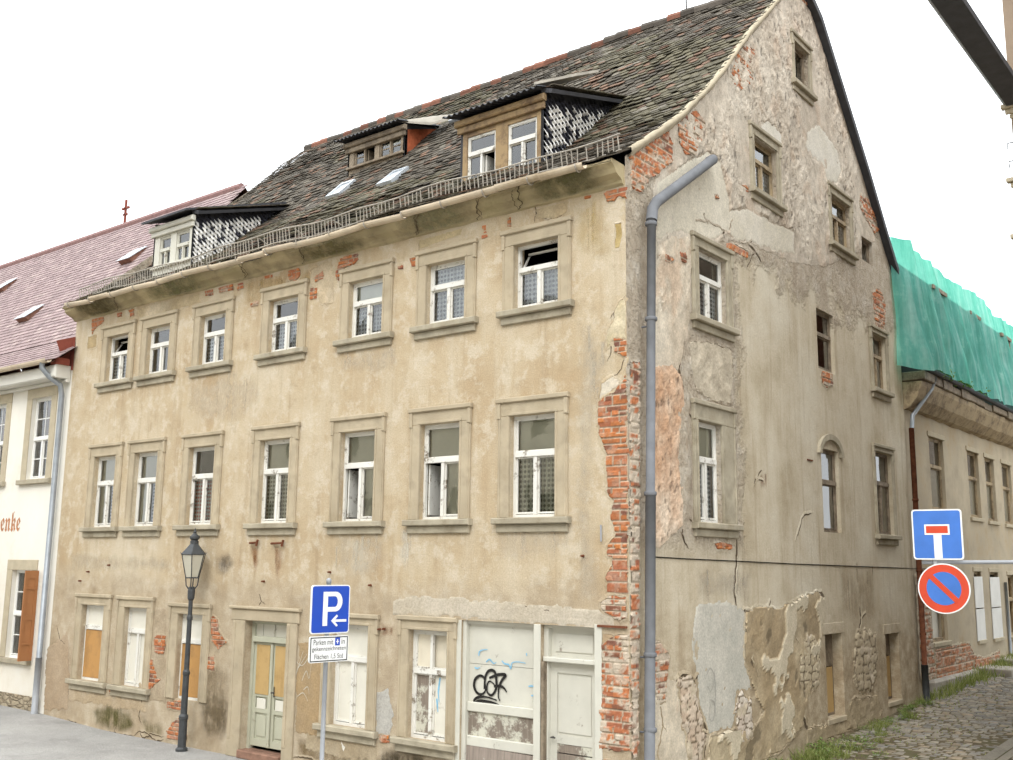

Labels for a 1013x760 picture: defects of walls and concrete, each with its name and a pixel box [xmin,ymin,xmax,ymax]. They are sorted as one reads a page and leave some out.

flaking render [604,0,879,267]
flaking render [655,217,734,548]
flaking render [595,297,642,760]
flaking render [148,633,168,690]
flaking render [166,698,189,743]
flaking render [207,614,229,672]
flaking render [655,588,883,760]